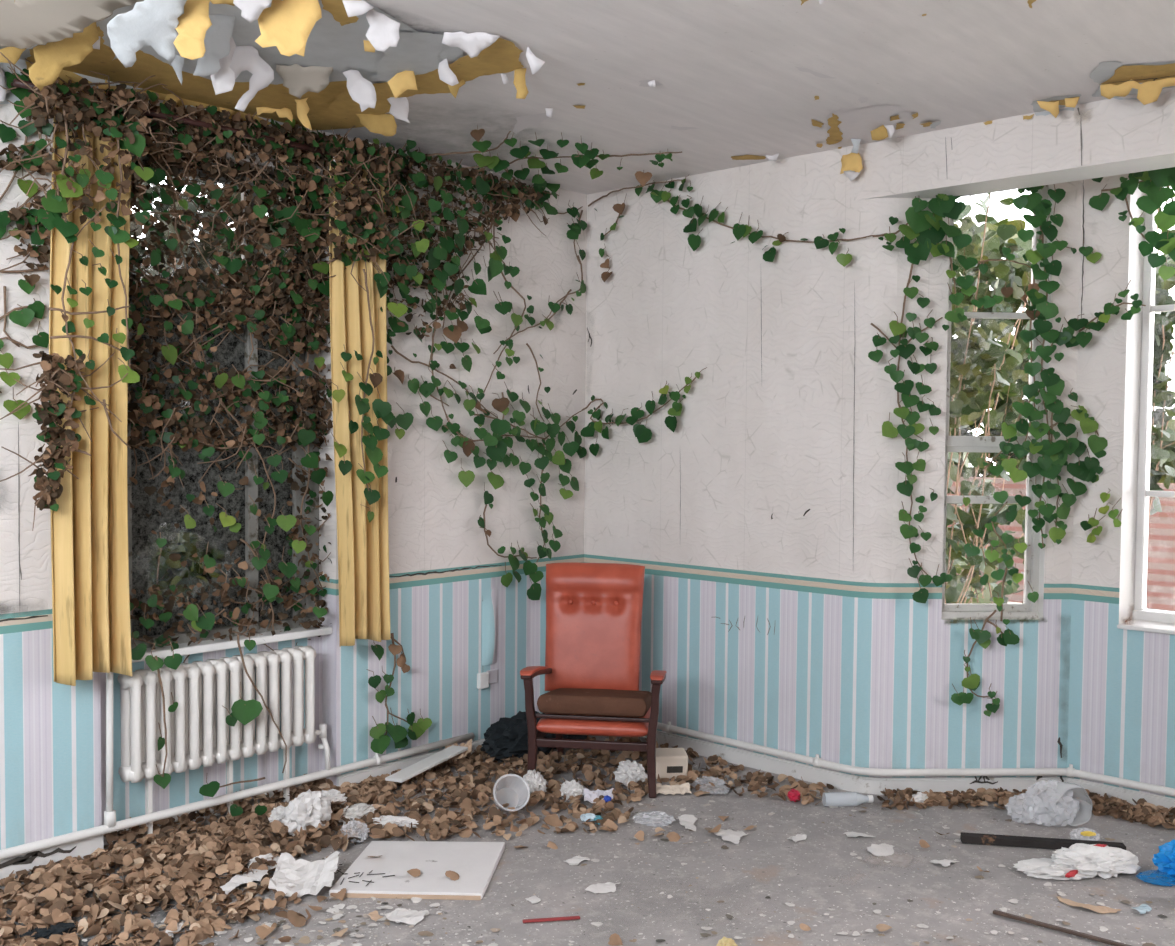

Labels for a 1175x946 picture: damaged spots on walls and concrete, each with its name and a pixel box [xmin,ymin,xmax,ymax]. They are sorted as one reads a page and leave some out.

peeling [0,0,545,136]
peeling [1023,61,1175,120]
peeling [811,97,941,181]
crack [0,846,76,869]